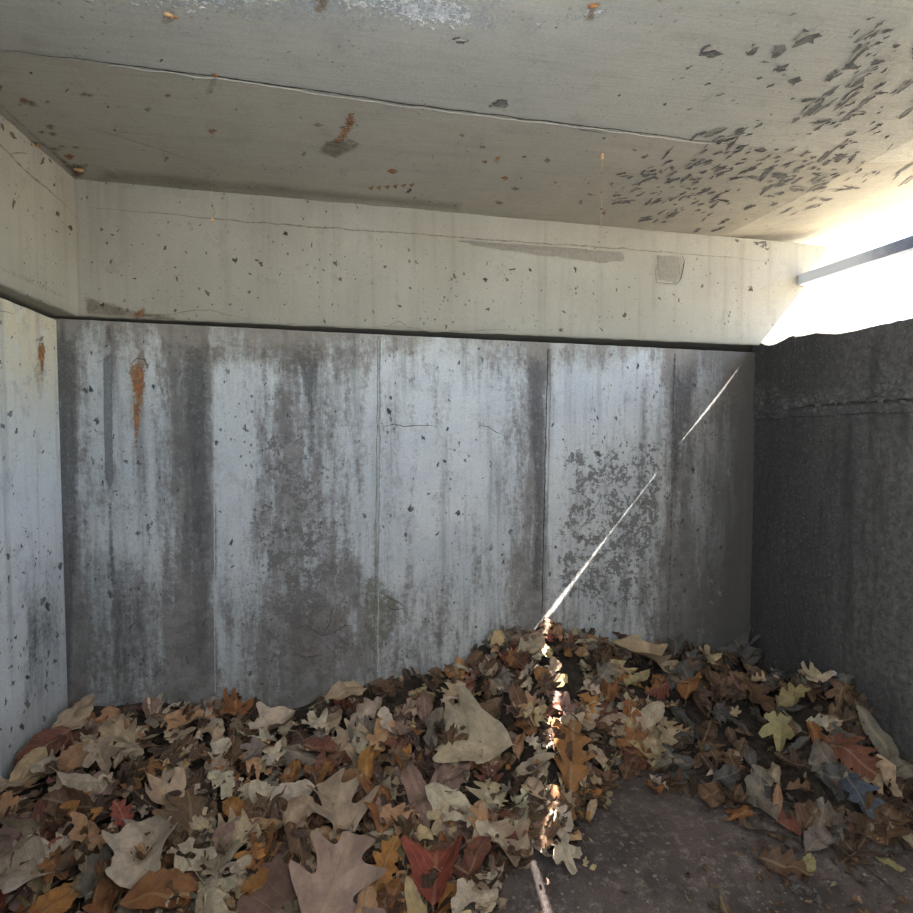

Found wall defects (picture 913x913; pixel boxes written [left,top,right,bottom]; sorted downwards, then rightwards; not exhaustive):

water stain [131,0,494,31]
corrosion [324,113,355,157]
crack [14,51,764,149]
crack [0,144,770,262]
water stain [57,334,77,678]
water stain [103,355,113,486]
corrosion [130,364,145,442]
water stain [175,356,207,656]
water stain [292,353,316,411]
water stain [528,362,545,588]
water stain [672,374,692,481]
water stain [366,579,397,652]